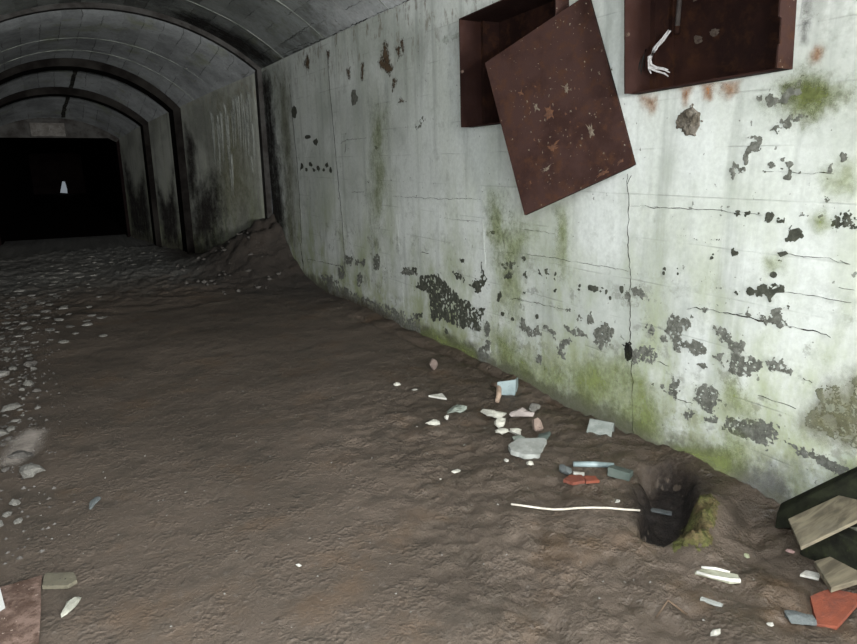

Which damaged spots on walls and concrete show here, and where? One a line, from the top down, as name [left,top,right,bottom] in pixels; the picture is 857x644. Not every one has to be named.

rust [518,86,554,121]
rust [528,108,596,179]
spalling [676,104,703,136]
damp [783,82,836,118]
peeling [321,254,491,363]
crack [496,174,764,431]
peeling [622,307,793,377]
peeling [683,382,849,475]
spalling [805,375,857,448]